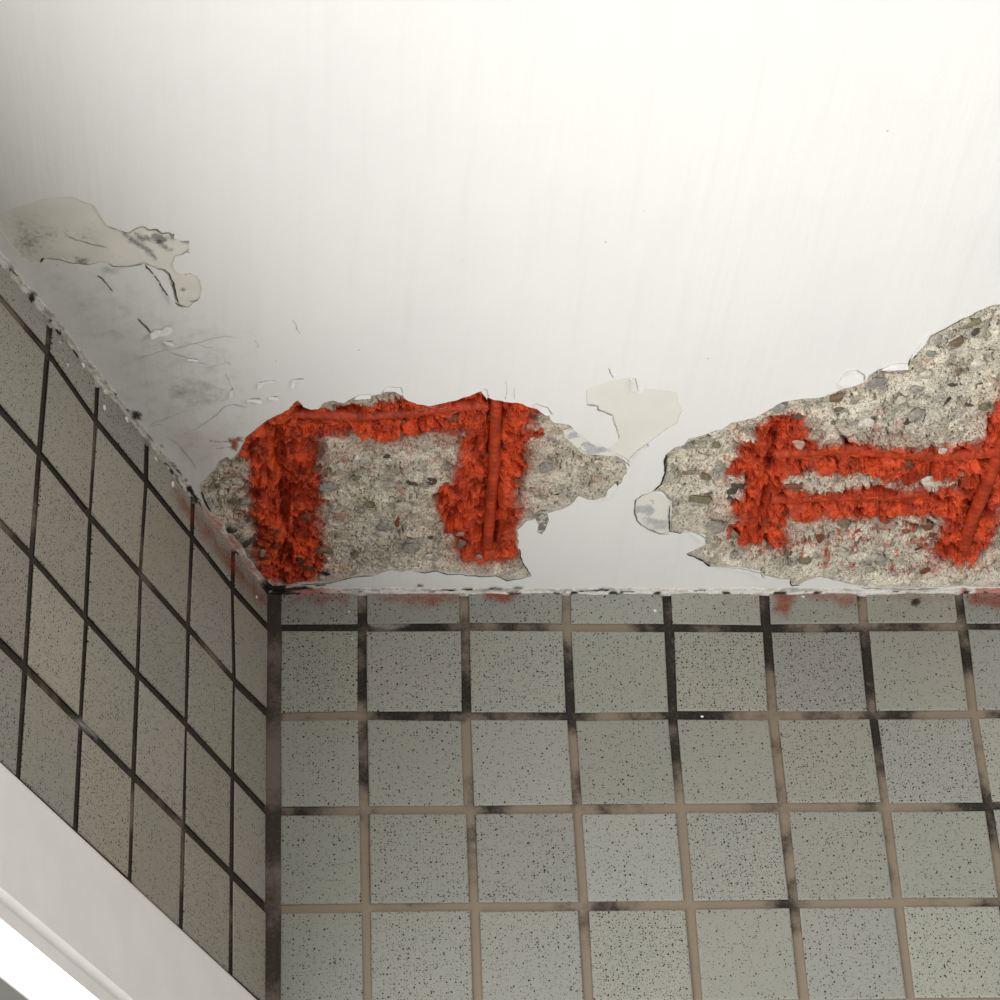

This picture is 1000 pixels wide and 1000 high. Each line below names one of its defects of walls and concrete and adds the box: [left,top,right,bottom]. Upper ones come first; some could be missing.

peeling [0,196,202,307]
crack [134,336,256,470]
spalling [199,378,682,586]
spalling [634,304,1000,590]